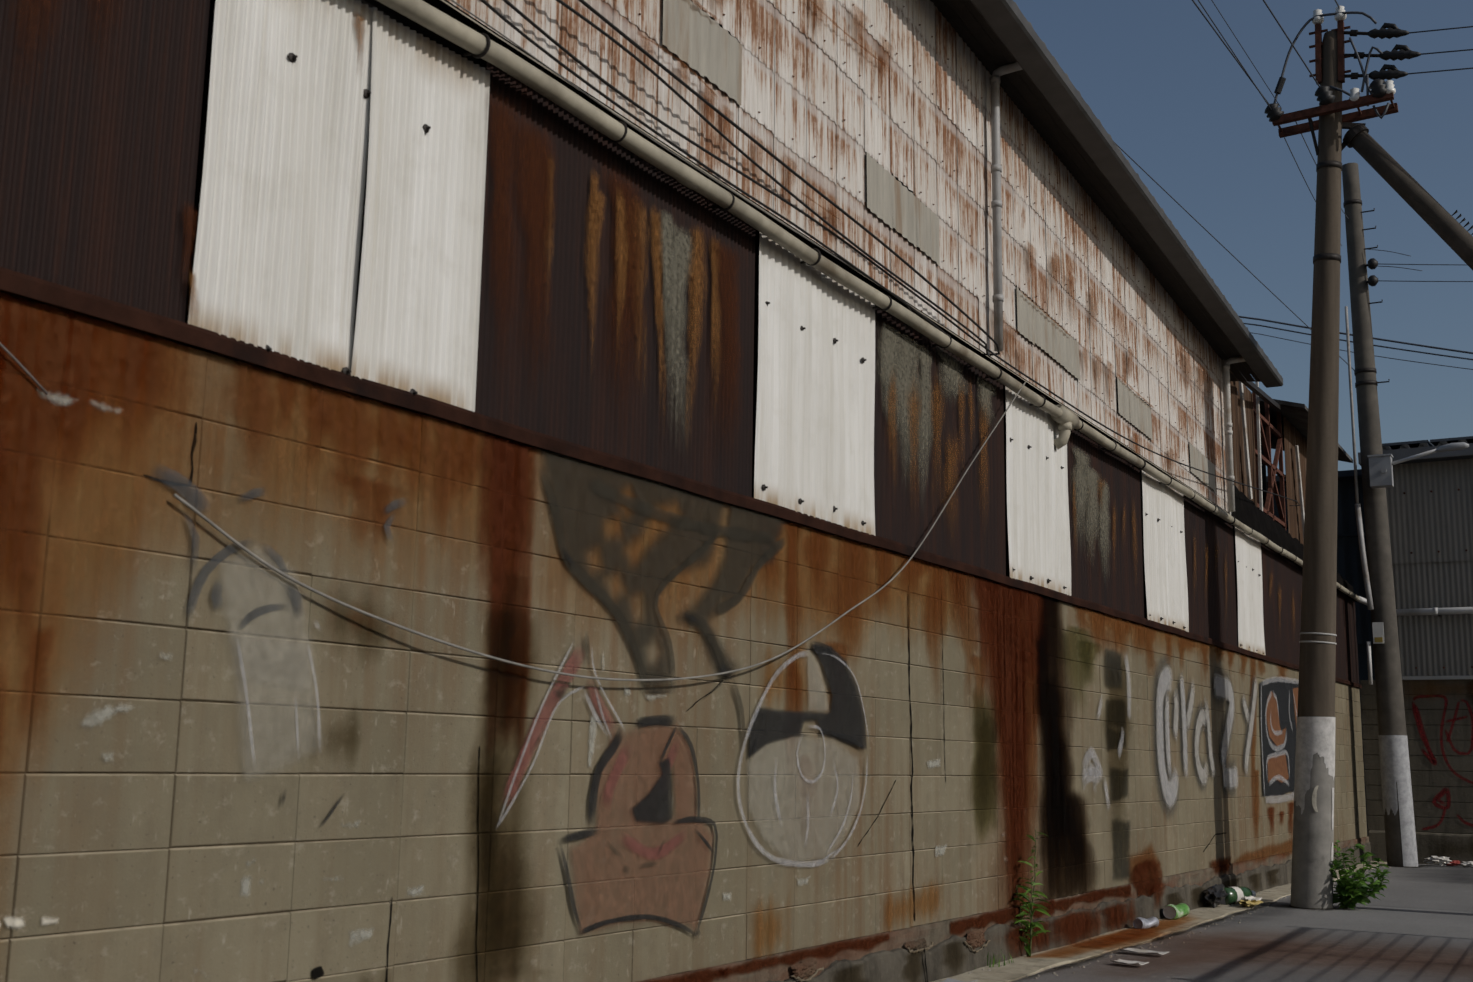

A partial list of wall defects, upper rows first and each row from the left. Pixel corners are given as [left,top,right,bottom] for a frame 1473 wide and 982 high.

corrosion [638,33,733,139]
corrosion [809,0,892,73]
corrosion [588,176,663,357]
corrosion [692,231,720,367]
corrosion [1028,242,1098,323]
corrosion [482,431,535,745]
corrosion [950,573,1166,954]
leakage [1036,595,1094,902]
corrosion [1212,857,1231,873]